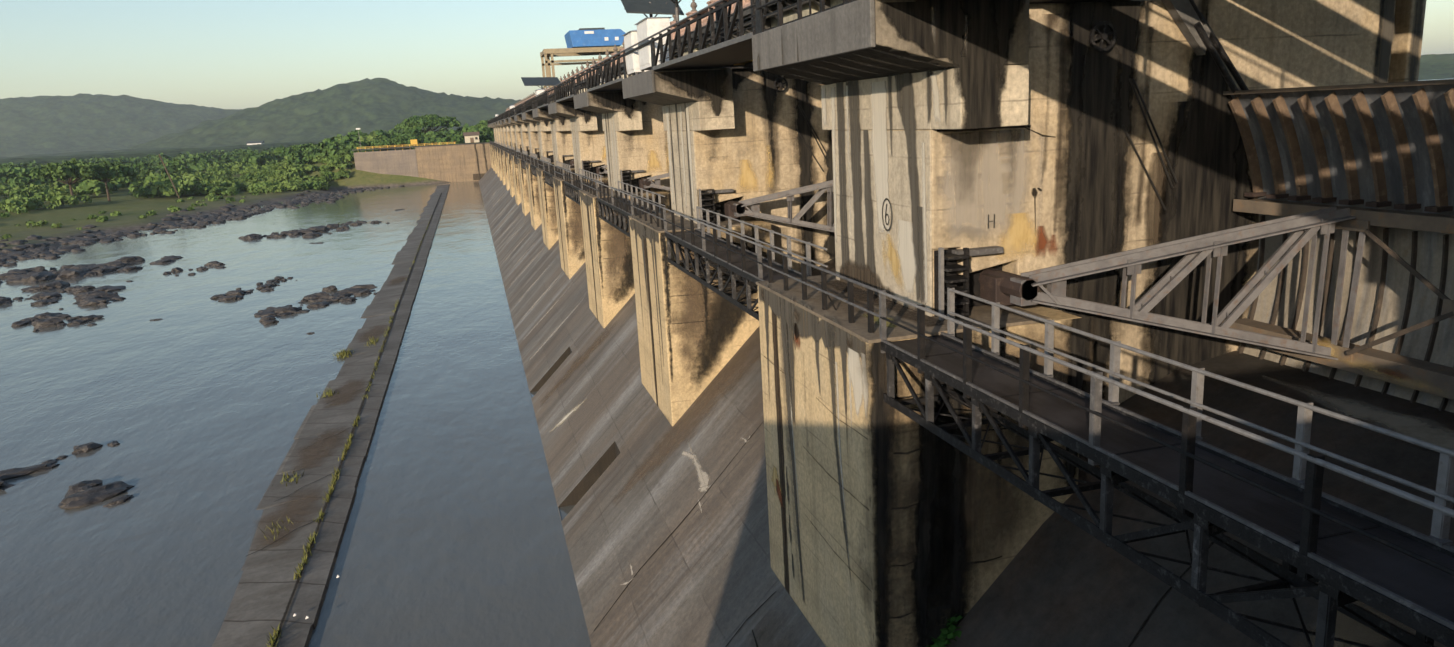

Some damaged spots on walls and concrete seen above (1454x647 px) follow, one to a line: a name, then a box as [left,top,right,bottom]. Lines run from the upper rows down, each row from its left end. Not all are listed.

water stain [488,0,1259,647]